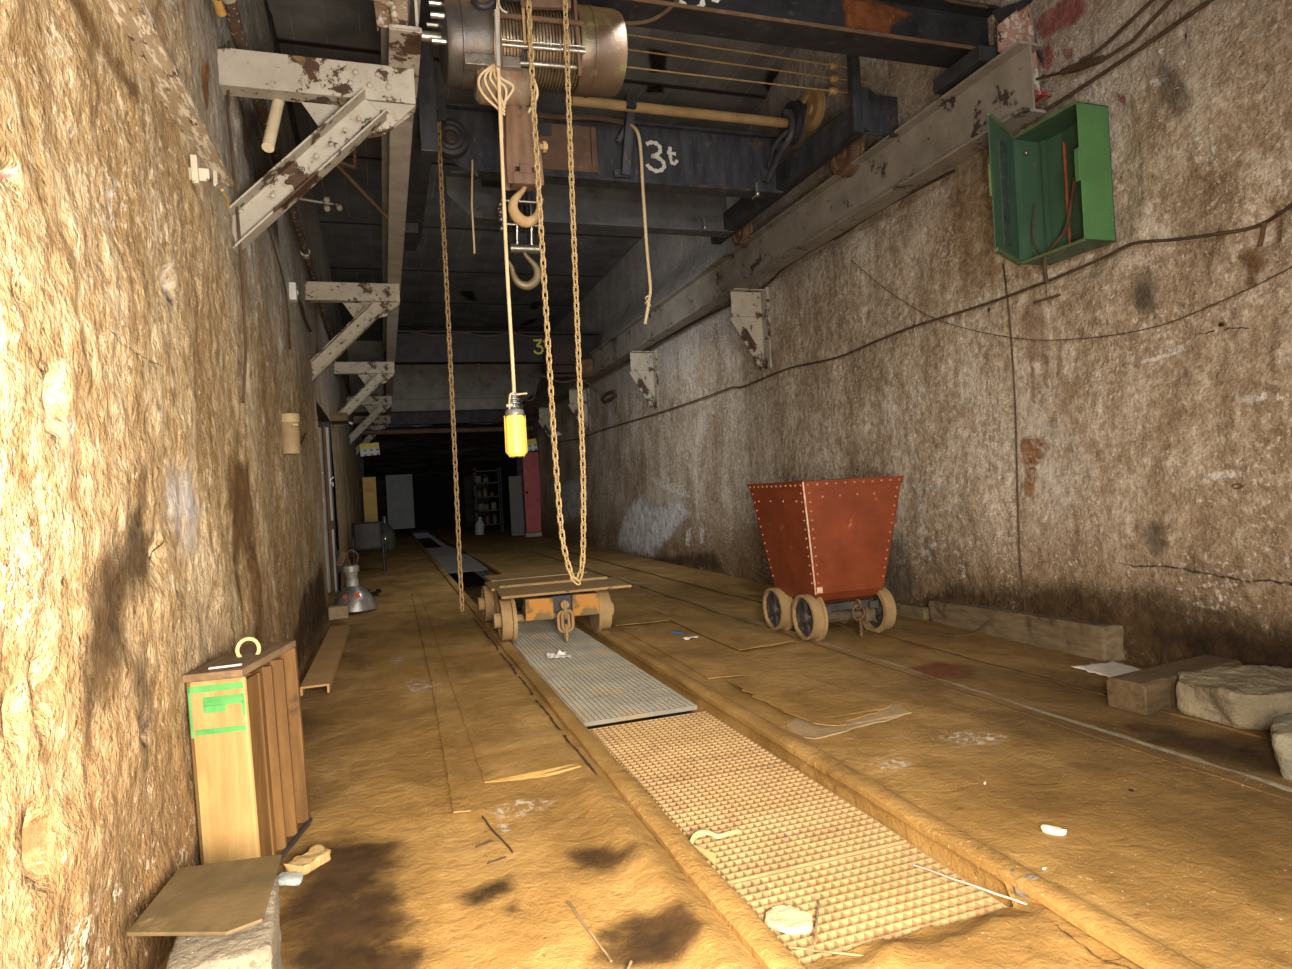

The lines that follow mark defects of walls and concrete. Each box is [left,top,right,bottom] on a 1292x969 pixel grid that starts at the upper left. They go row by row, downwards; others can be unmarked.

rust [843,0,909,34]
rust [1021,438,1046,495]
leakage [229,463,263,643]
leakage [90,522,151,692]
leakage [295,568,327,657]
crack [539,545,1292,800]
leakage [599,905,701,967]